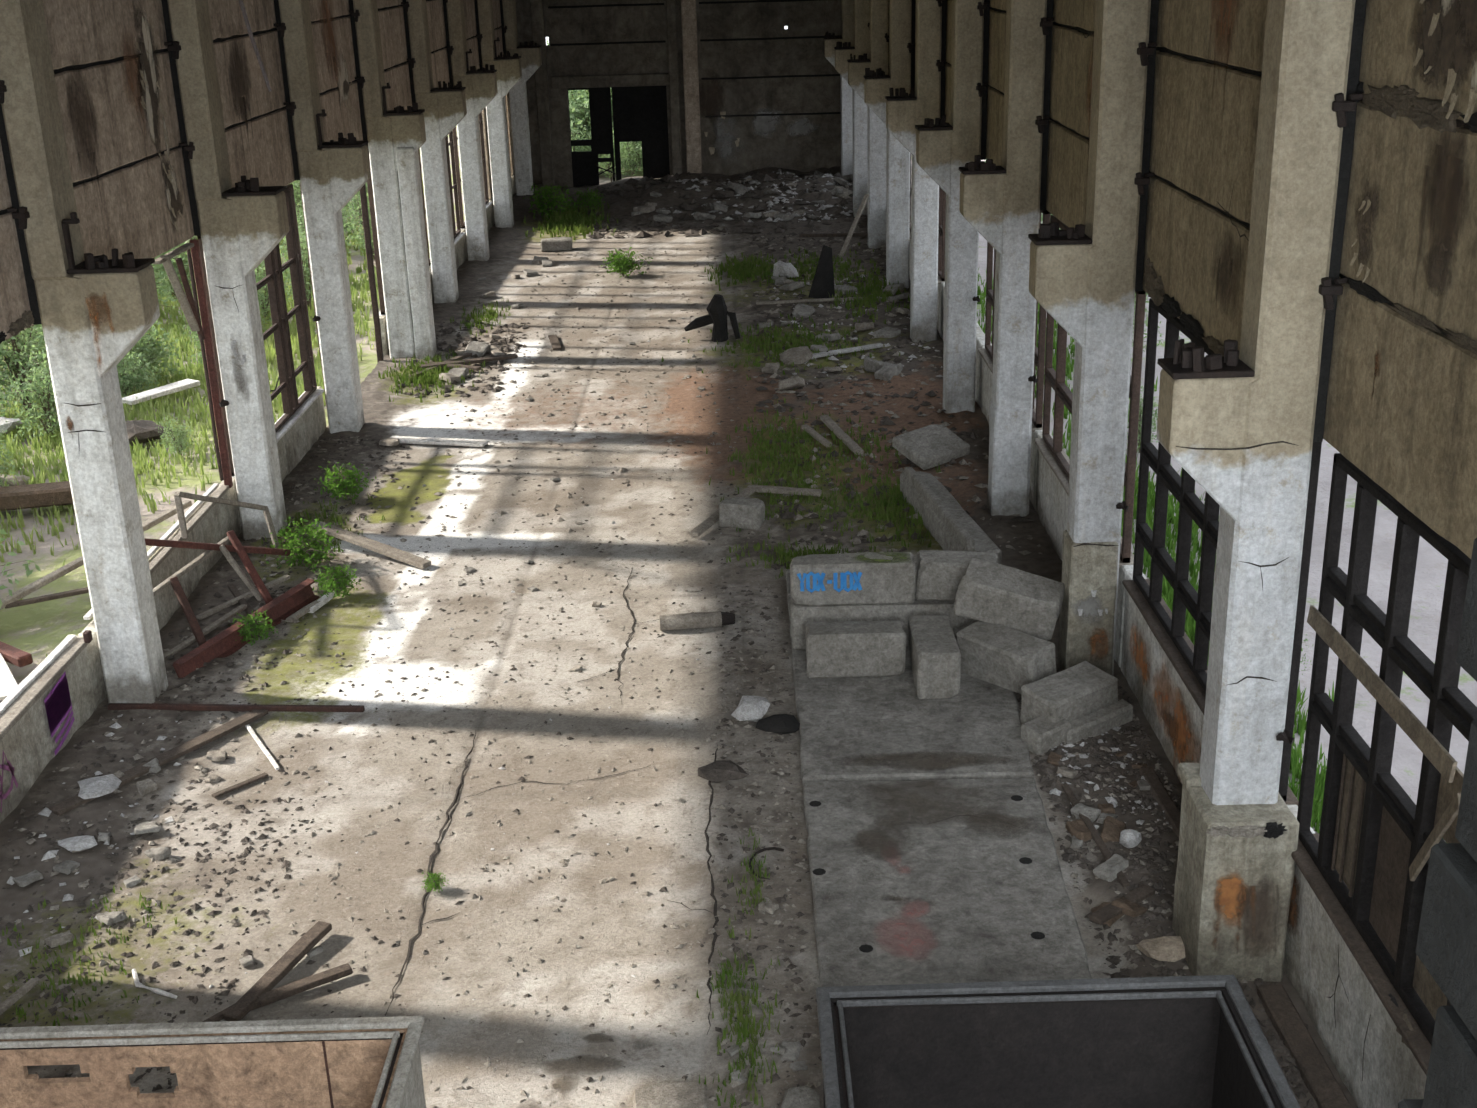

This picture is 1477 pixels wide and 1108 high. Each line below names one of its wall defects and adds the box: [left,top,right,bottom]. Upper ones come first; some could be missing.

water stain [67,73,99,185]
peeling [1356,0,1477,133]
spalling [1144,258,1224,357]
crack [578,567,659,705]
corrosion [1130,628,1195,777]
crack [385,730,651,1016]
corrosion [1213,875,1255,944]